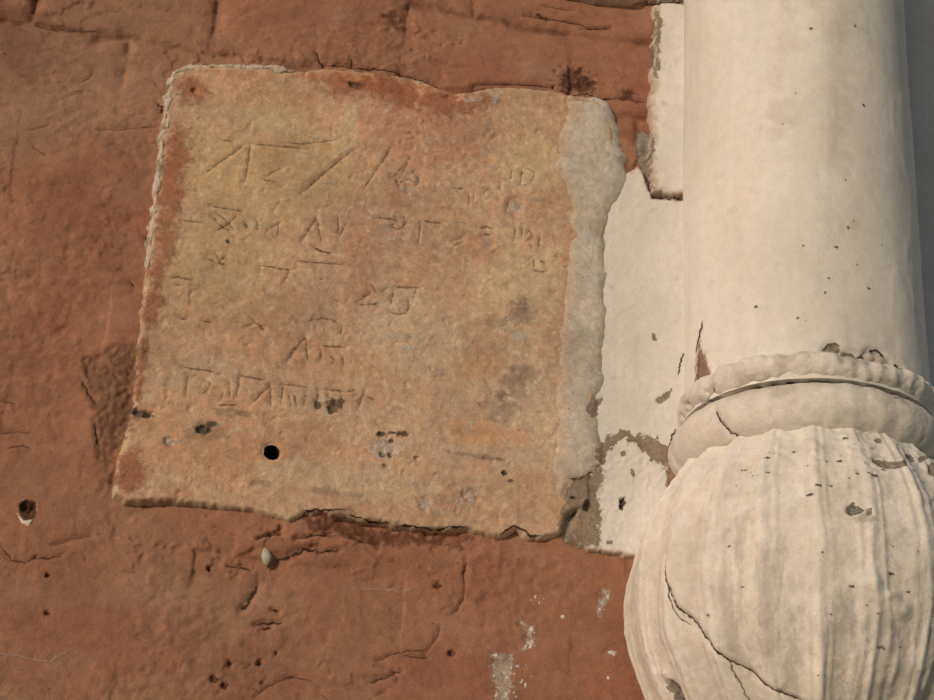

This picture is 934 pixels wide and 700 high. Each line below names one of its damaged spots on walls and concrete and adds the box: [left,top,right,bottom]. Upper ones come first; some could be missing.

flaking render [822,343,884,359]
peeling [586,397,603,417]
spalling [872,454,934,475]
spalling [556,429,670,549]
spalling [846,502,872,515]
crack [665,569,801,700]